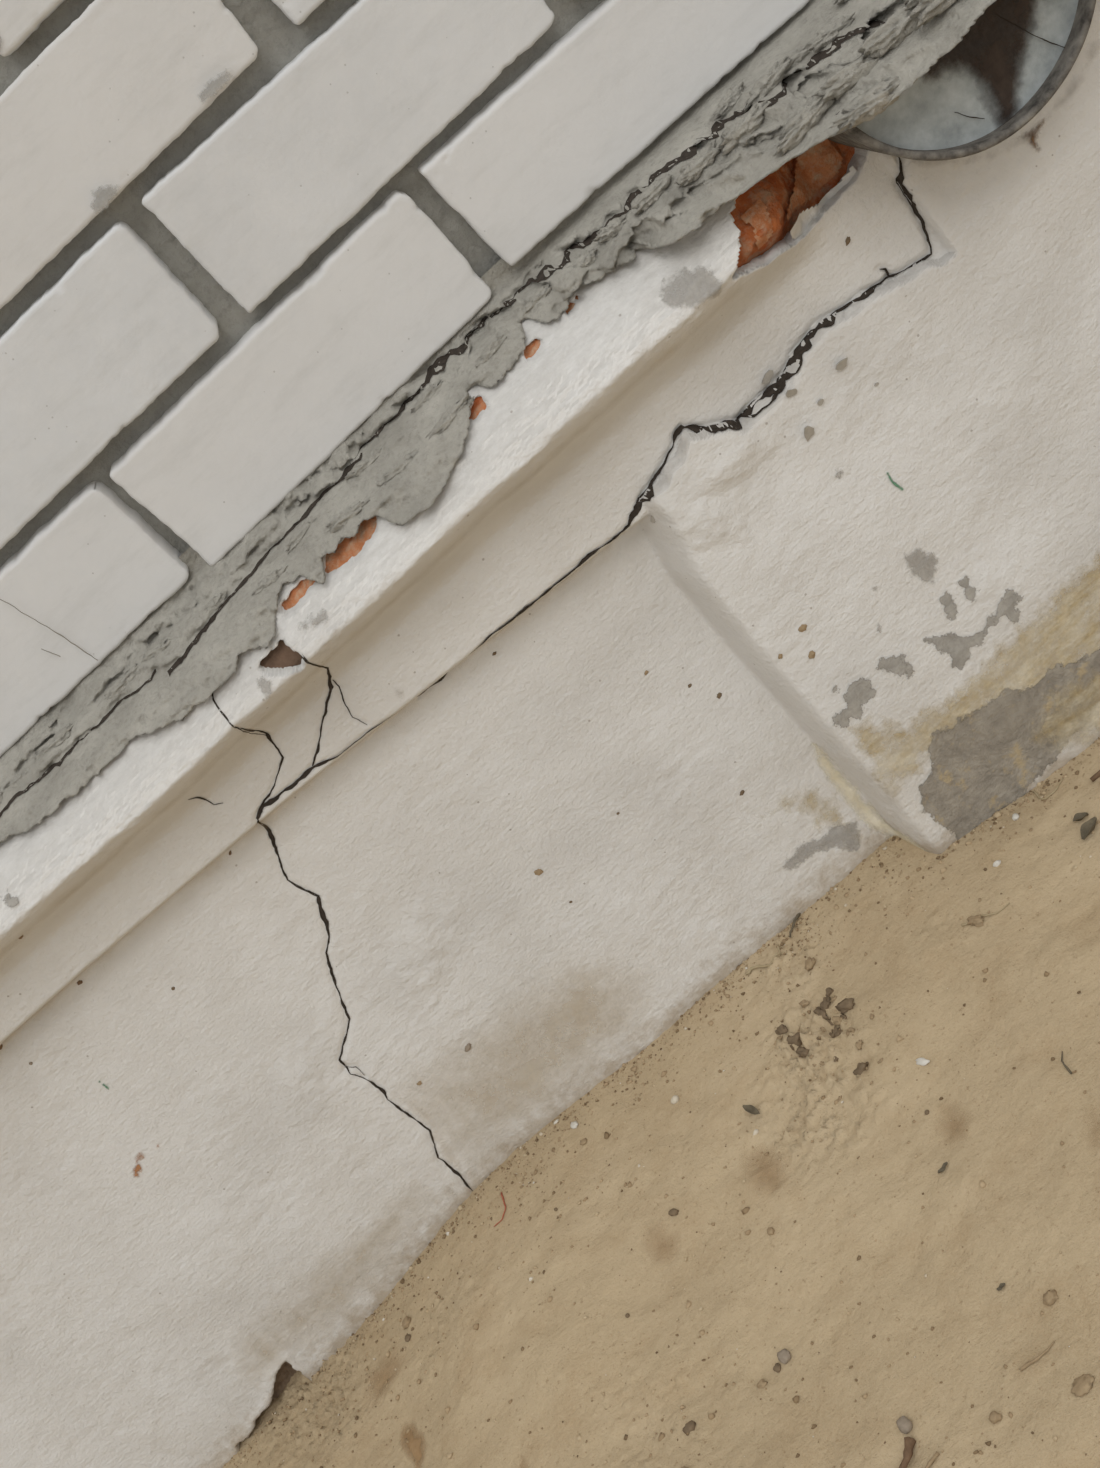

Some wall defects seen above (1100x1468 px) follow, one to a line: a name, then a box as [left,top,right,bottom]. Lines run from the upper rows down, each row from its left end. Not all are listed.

flaking render [730,139,857,268]
flaking render [524,339,540,359]
crack [0,3,932,817]
flaking render [469,396,486,420]
flaking render [282,516,377,610]
flaking render [260,640,302,669]
peeling [832,654,915,728]
peeling [923,576,1024,670]
damp [860,559,1100,775]
peeling [919,649,1100,840]
peeling [783,823,860,869]
crack [212,656,473,1191]